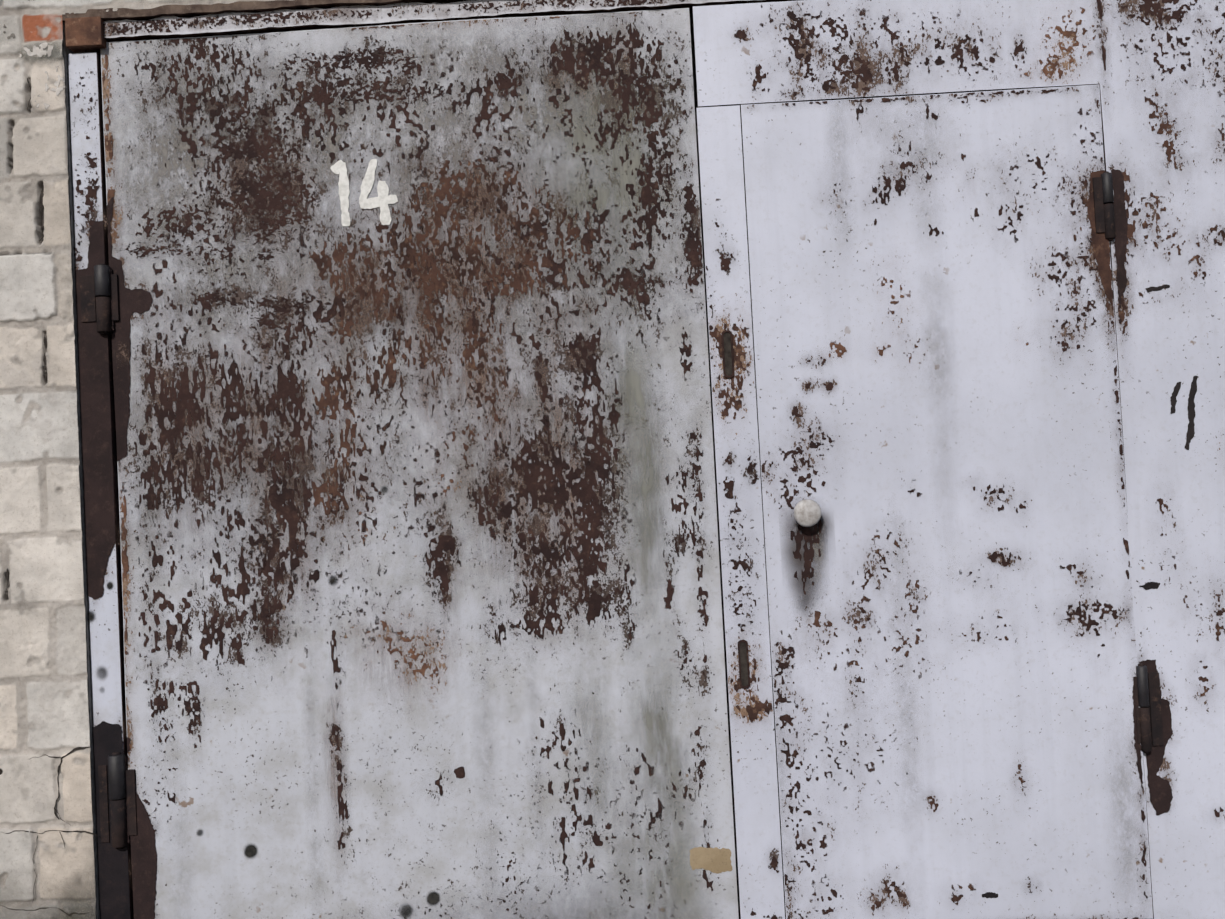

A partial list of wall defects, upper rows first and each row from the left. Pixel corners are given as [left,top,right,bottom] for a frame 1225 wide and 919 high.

rust [734,0,1225,506]
rust [71,10,944,919]
rust [970,476,1032,513]
rust [952,611,1010,659]
rust [947,543,1031,590]
rust [1054,563,1136,657]
rust [1159,551,1225,648]
rust [1185,661,1214,712]
rust [1137,798,1148,898]
rust [937,884,976,910]